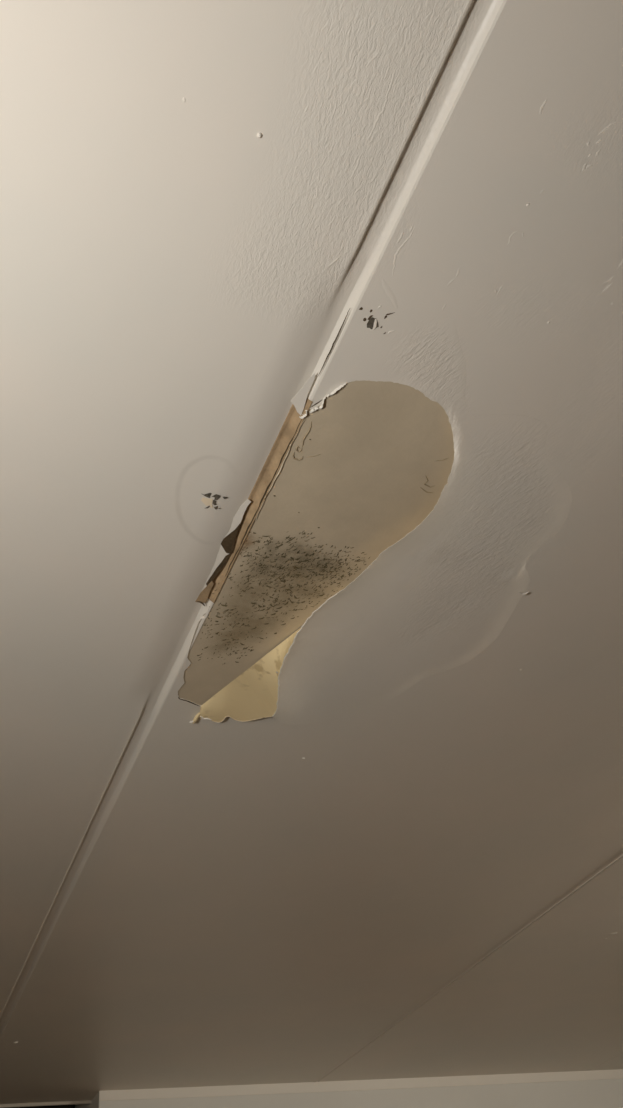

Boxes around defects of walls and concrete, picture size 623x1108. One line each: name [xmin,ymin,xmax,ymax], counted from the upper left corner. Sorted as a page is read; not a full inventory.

water stain [197,531,370,664]
peeling [178,316,573,725]